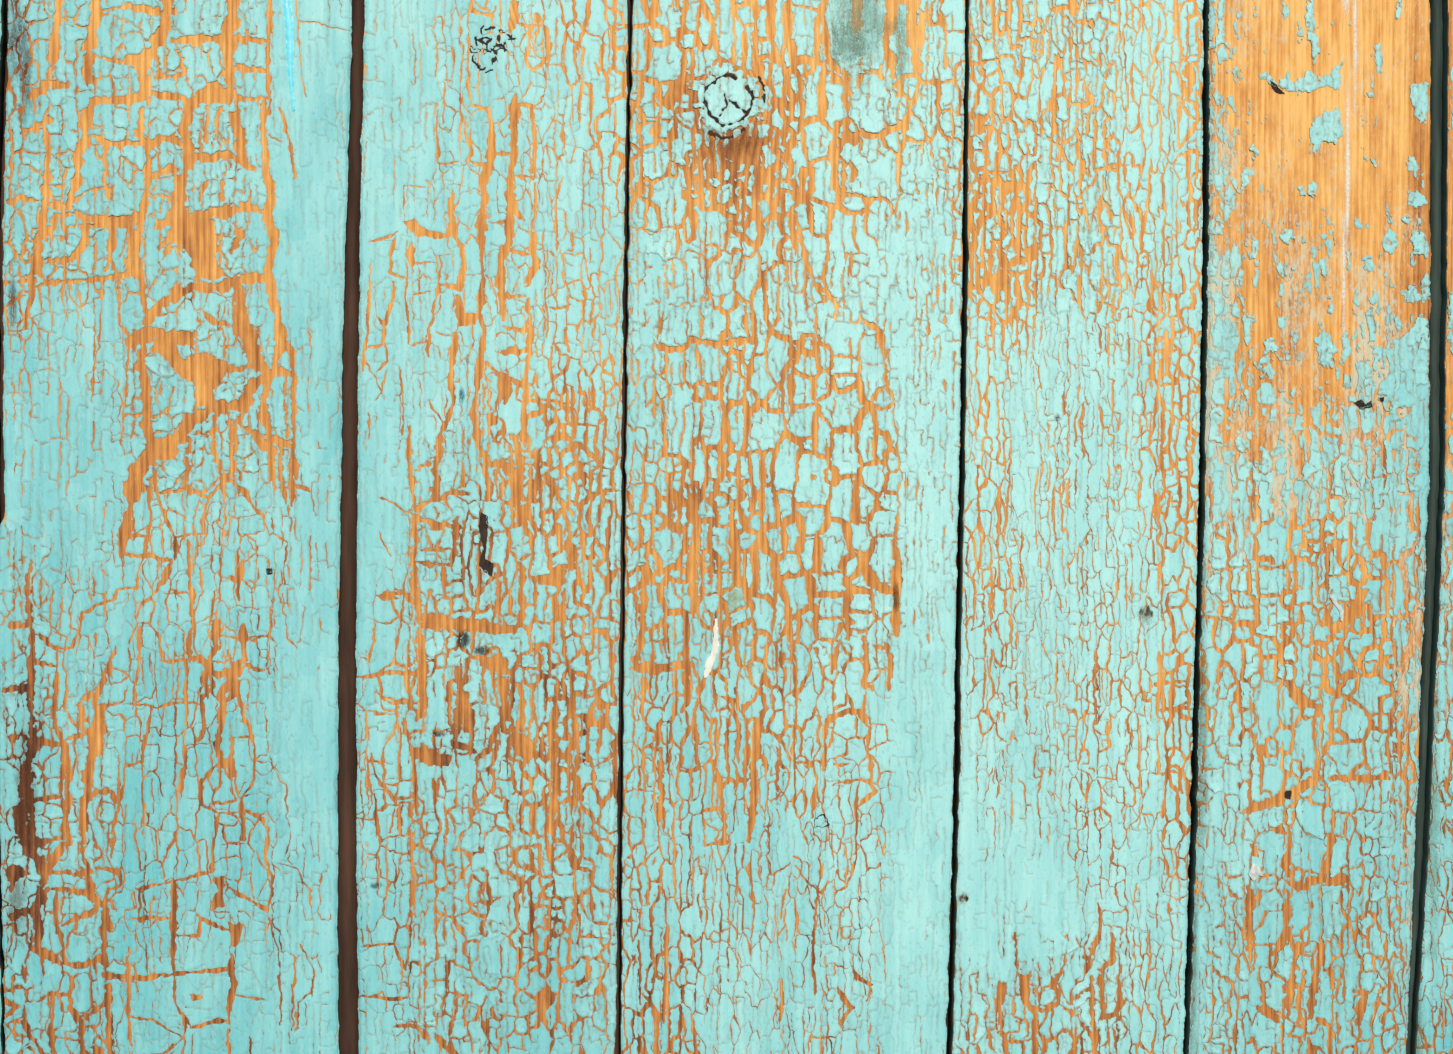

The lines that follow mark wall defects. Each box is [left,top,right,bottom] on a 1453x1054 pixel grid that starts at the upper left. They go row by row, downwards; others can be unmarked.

peeling [2,0,305,515]
crack [3,300,397,1054]
crack [357,0,628,461]
peeling [380,0,1143,1054]
crack [548,0,1203,1054]
peeling [1188,0,1453,1054]
crack [1417,845,1453,1054]